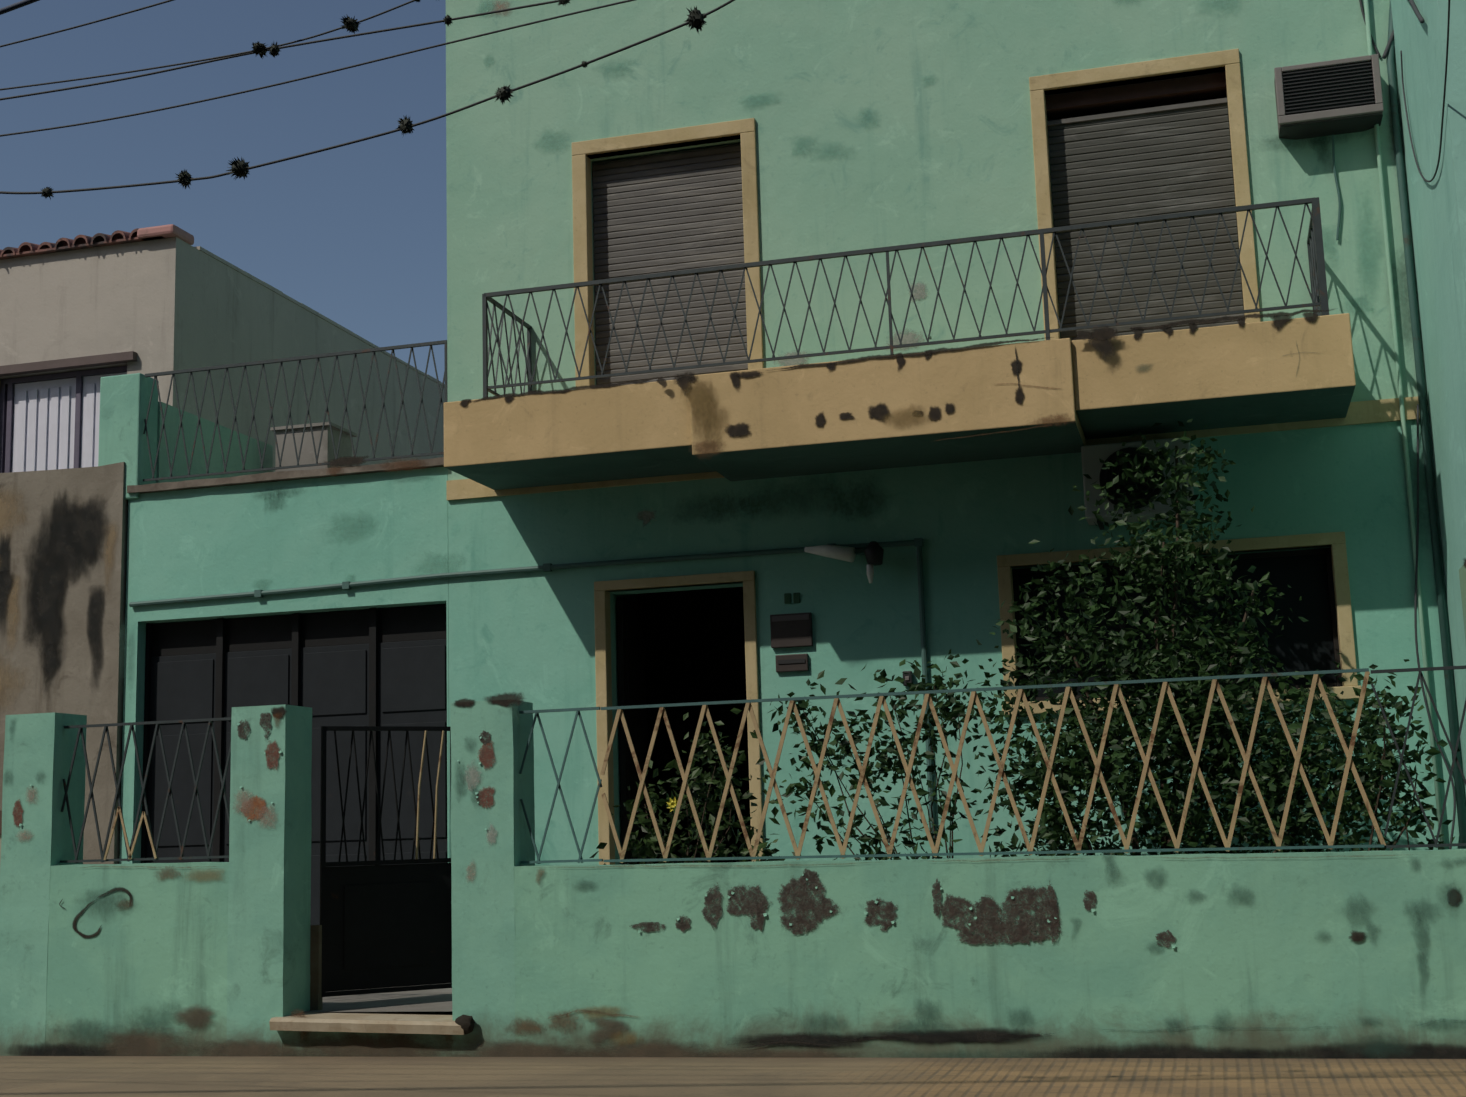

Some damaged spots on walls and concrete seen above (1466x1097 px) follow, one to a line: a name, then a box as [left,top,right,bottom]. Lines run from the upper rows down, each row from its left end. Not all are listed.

spalling [815,403,954,427]
leakage [0,493,116,678]
corrosion [271,706,286,724]
peeling [631,869,838,935]
peeling [864,898,897,931]
peeling [932,879,1061,945]